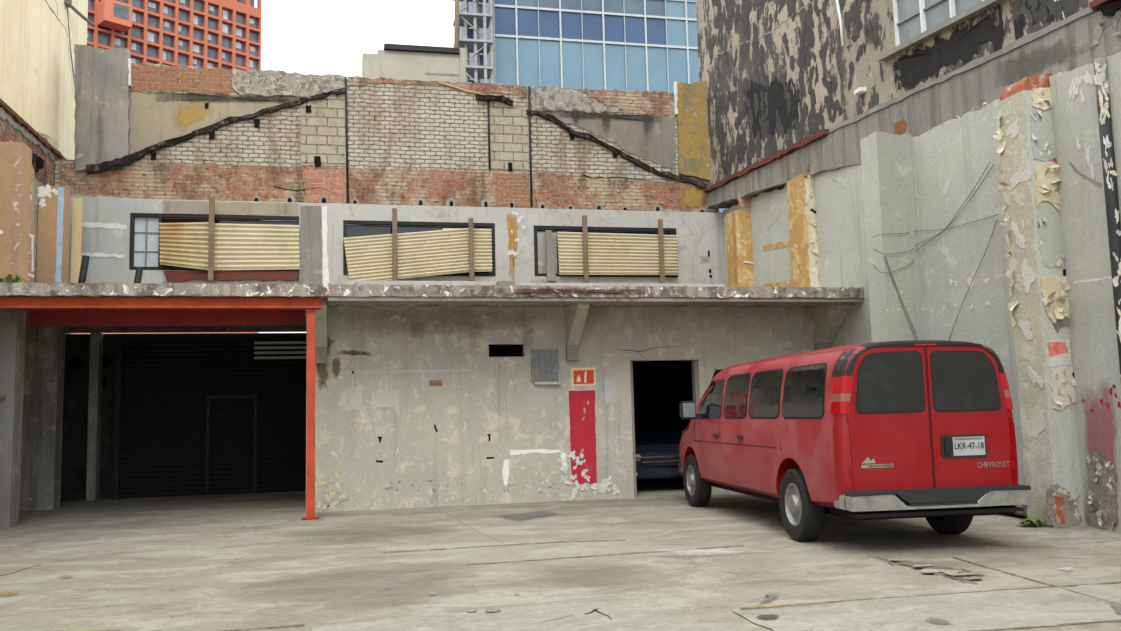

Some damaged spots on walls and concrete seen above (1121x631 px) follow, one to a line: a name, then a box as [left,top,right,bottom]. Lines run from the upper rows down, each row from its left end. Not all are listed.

peeling [1069,62,1118,191]
peeling [1112,252,1121,342]
peeling [493,448,620,499]
peeling [1046,448,1118,530]